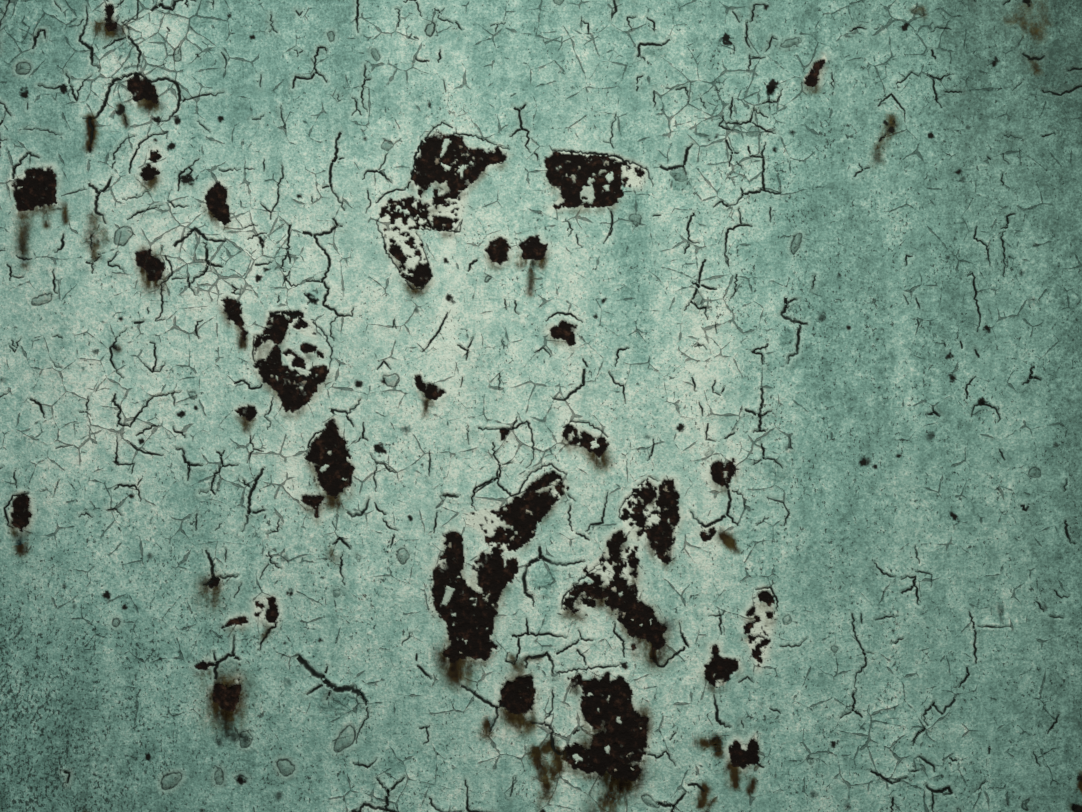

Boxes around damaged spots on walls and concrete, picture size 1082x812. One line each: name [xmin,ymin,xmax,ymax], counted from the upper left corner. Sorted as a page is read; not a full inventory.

crack [896,27,962,108]
crack [581,0,783,348]
crack [0,0,693,598]
crack [691,275,816,469]
crack [944,213,1016,423]
crack [690,485,769,528]
corrosion [194,661,245,728]
crack [212,623,277,680]
crack [296,655,405,812]
crack [647,732,705,812]
crack [840,546,920,719]
crack [870,611,1011,812]